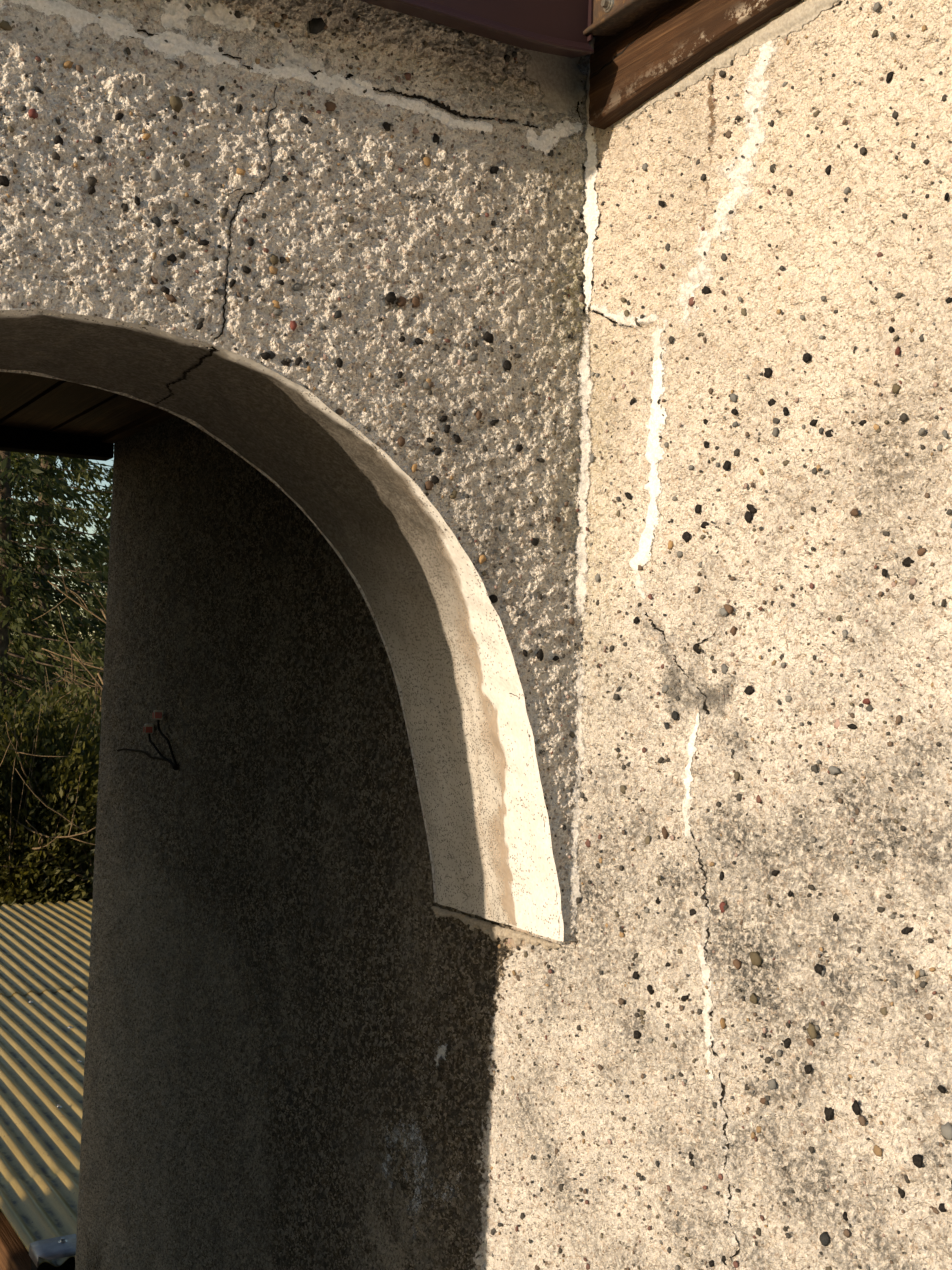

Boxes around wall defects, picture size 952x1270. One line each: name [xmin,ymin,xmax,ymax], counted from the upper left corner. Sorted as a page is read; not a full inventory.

crack [0,0,584,404]
leakage [382,1116,461,1223]
crack [681,713,740,1269]